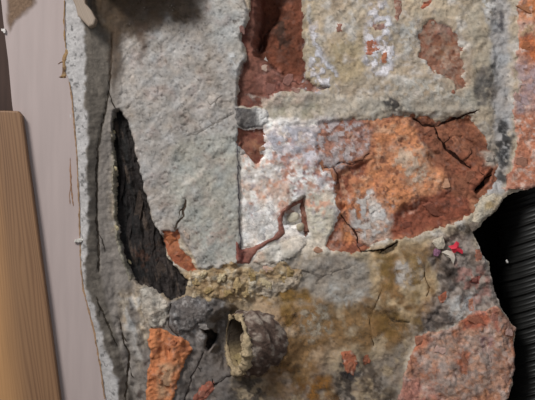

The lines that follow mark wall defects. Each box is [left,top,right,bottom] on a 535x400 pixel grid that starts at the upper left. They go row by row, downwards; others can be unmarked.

flaking render [237,0,329,108]
damp [304,25,338,93]
damp [363,1,421,76]
spalling [503,0,535,192]
flaking render [236,128,266,164]
crack [324,153,369,187]
spalling [313,113,498,254]
crack [413,110,492,191]
crack [340,214,397,254]
damp [396,261,415,283]
crack [96,297,134,400]
spalling [397,298,516,400]